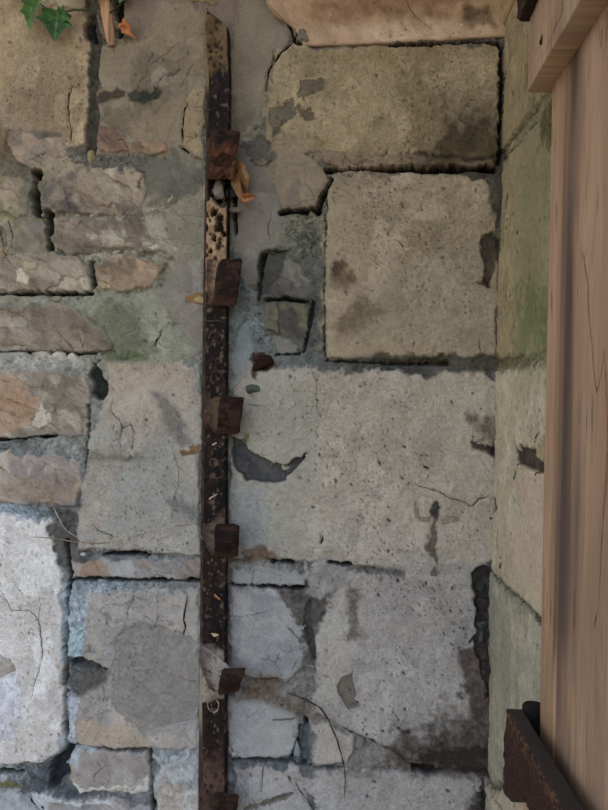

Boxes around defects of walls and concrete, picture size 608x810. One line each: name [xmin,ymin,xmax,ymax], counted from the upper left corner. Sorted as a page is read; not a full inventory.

spalling [477,232,500,287]
rust [250,352,275,379]
spalling [232,437,306,482]
spalling [517,439,545,473]
spalling [0,655,16,677]